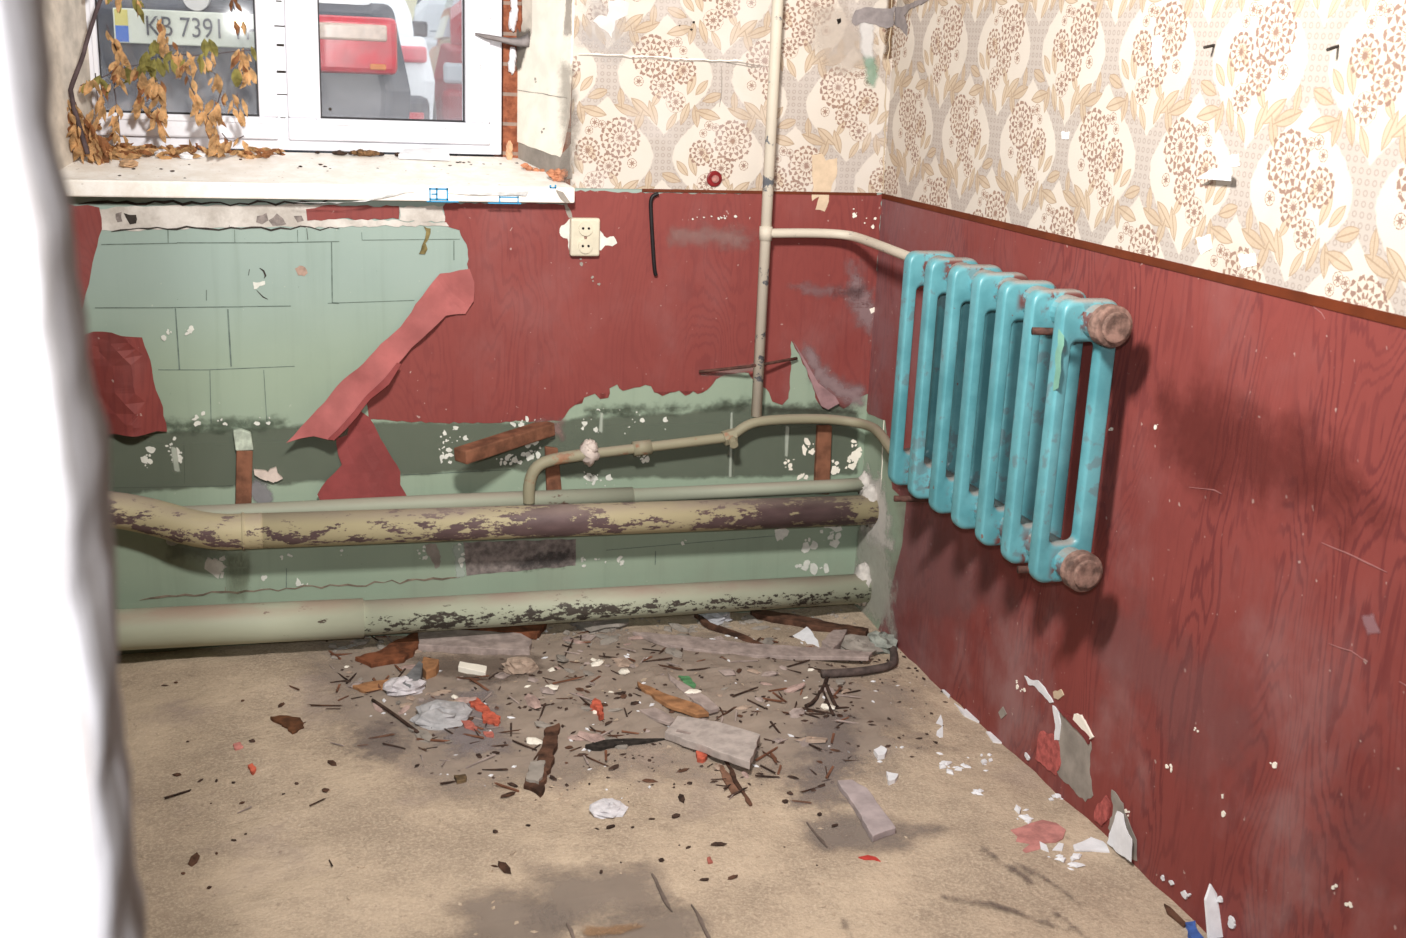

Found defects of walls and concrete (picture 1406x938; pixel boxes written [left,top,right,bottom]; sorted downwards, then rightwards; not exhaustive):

flaking render [100,192,448,231]
flaking render [556,190,600,286]
flaking render [599,231,617,250]
peeling [140,437,183,468]
peeling [439,426,468,464]
peeling [496,441,541,466]
peeling [784,438,815,480]
peeling [831,439,862,475]
peeling [583,471,613,486]
spalling [417,539,624,577]
peeling [795,526,842,575]
peeling [1073,713,1094,739]